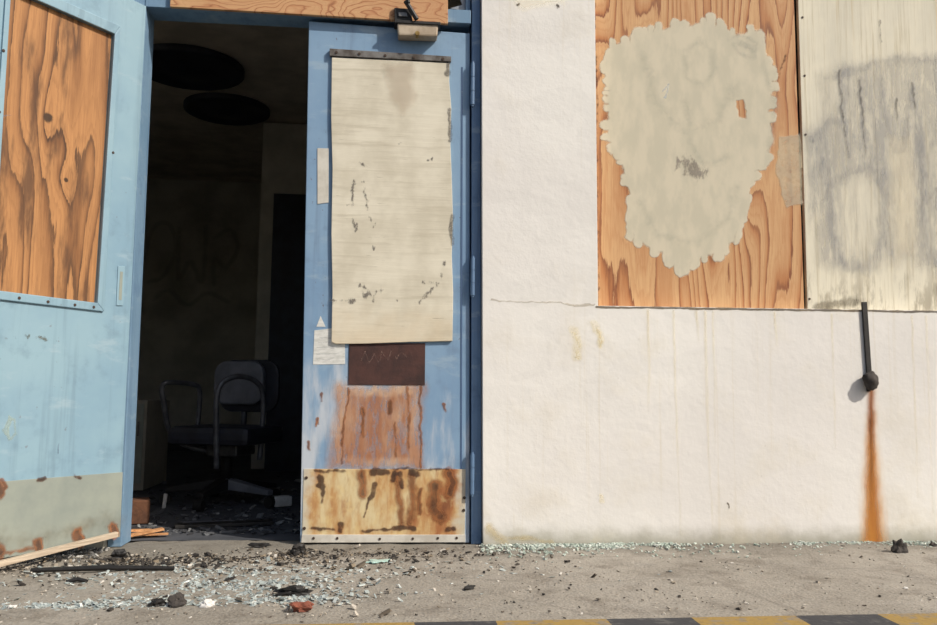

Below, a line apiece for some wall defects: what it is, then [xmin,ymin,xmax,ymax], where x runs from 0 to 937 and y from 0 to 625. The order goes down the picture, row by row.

corrosion [314,385,458,533]
corrosion [867,391,881,542]
corrosion [0,478,8,499]
corrosion [0,538,43,559]
corrosion [72,528,85,548]